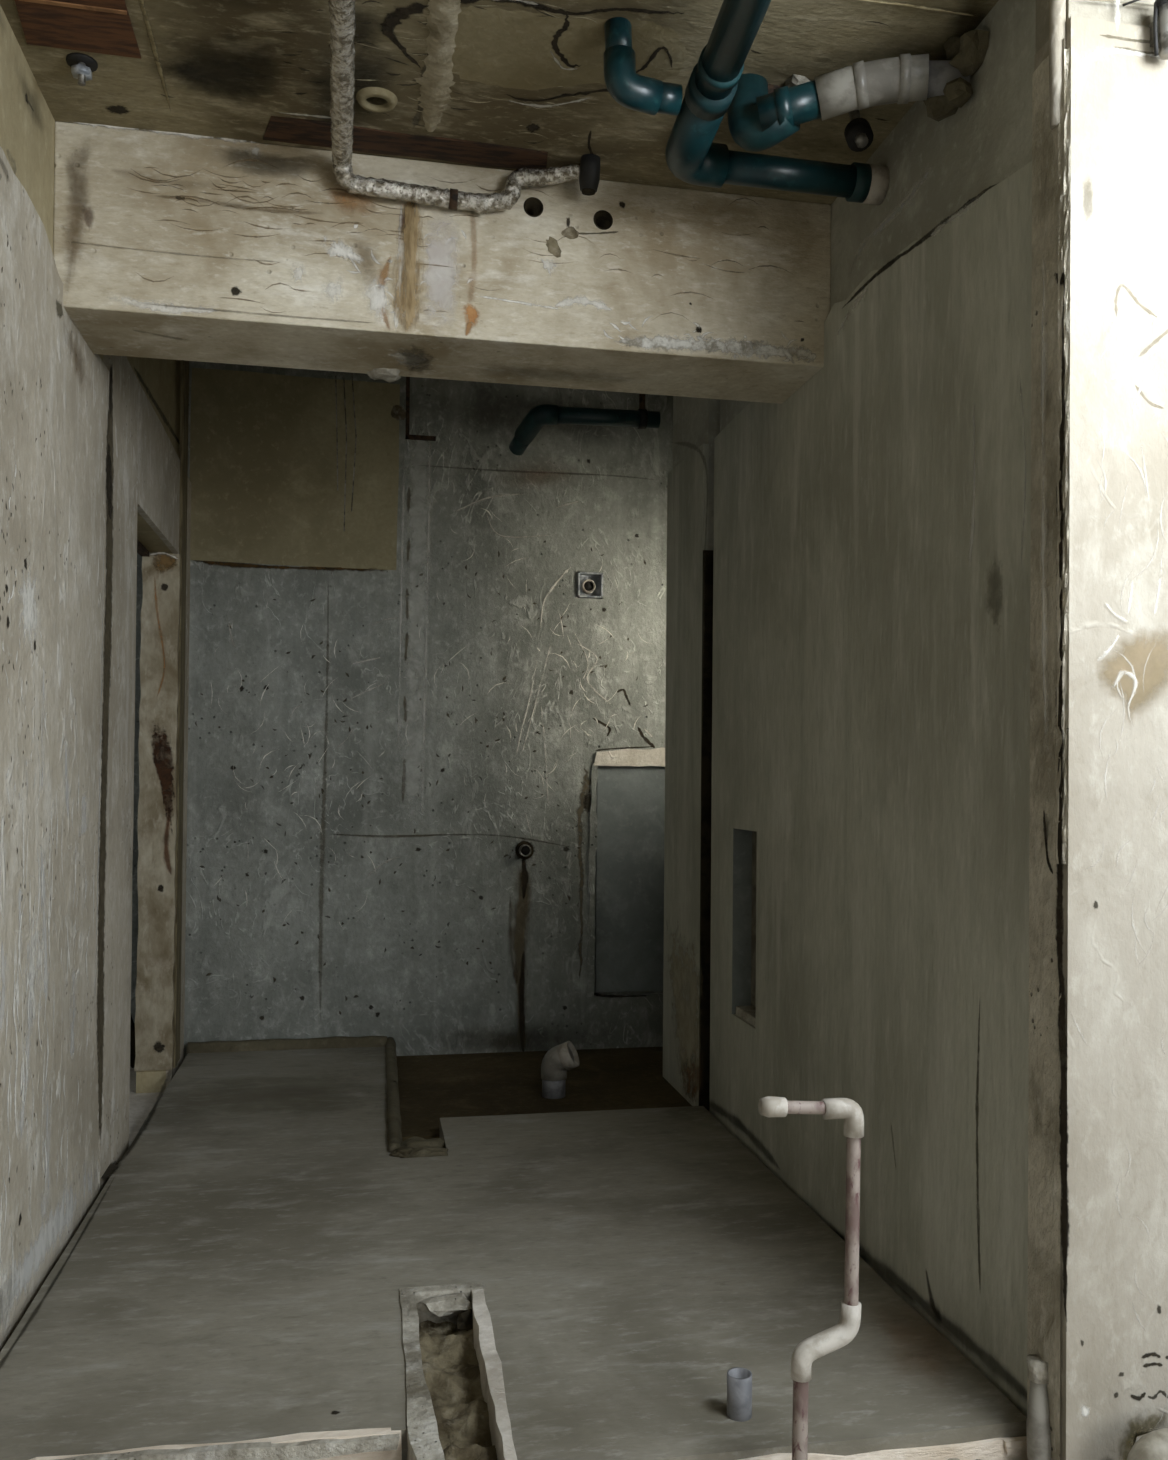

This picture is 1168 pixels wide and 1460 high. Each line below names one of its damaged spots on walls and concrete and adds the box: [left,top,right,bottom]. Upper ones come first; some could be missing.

crack [380,0,683,154]
damp [1102,636,1168,711]
corrosion [152,725,175,874]
corrosion [513,840,535,1052]